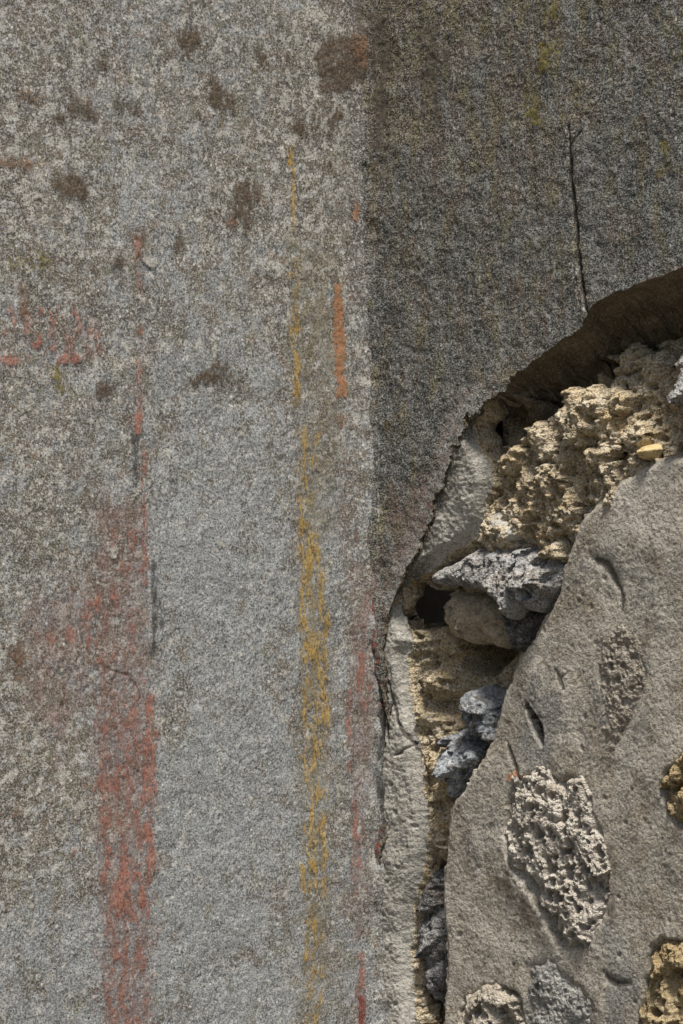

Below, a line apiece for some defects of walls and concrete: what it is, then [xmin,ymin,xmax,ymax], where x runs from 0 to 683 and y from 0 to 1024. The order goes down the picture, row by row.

damp [292,1,391,229]
crack [569,130,588,309]
flaking render [378,266,683,1024]